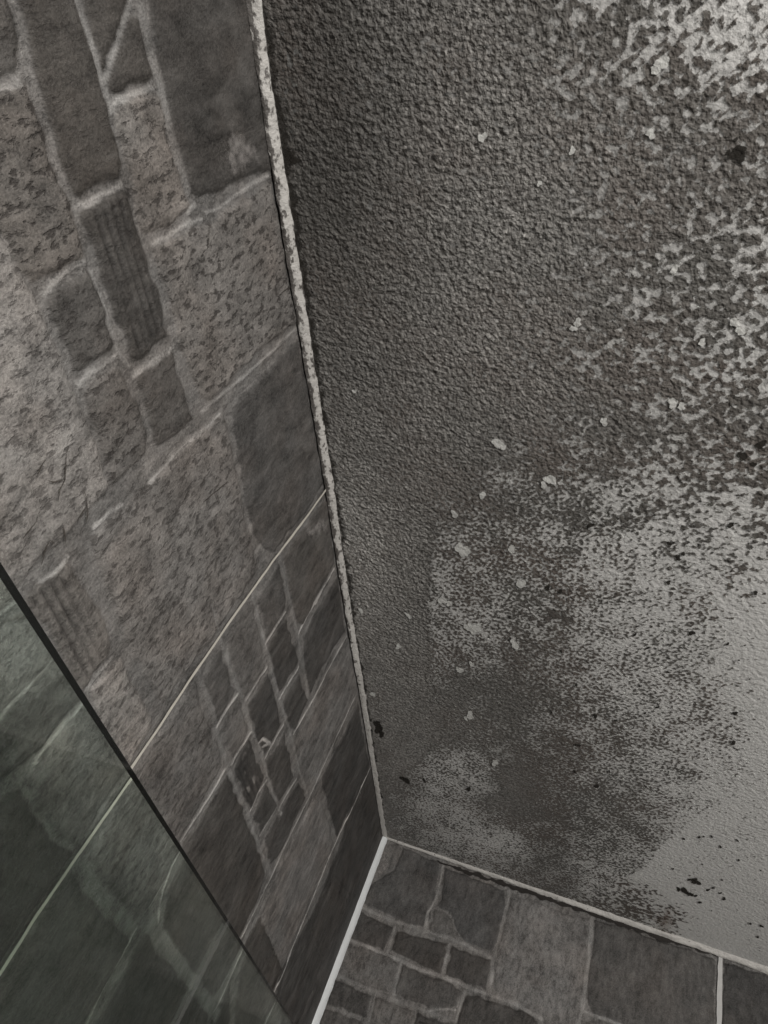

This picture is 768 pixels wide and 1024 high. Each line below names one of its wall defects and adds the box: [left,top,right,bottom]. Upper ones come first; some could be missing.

leakage [262,0,768,956]